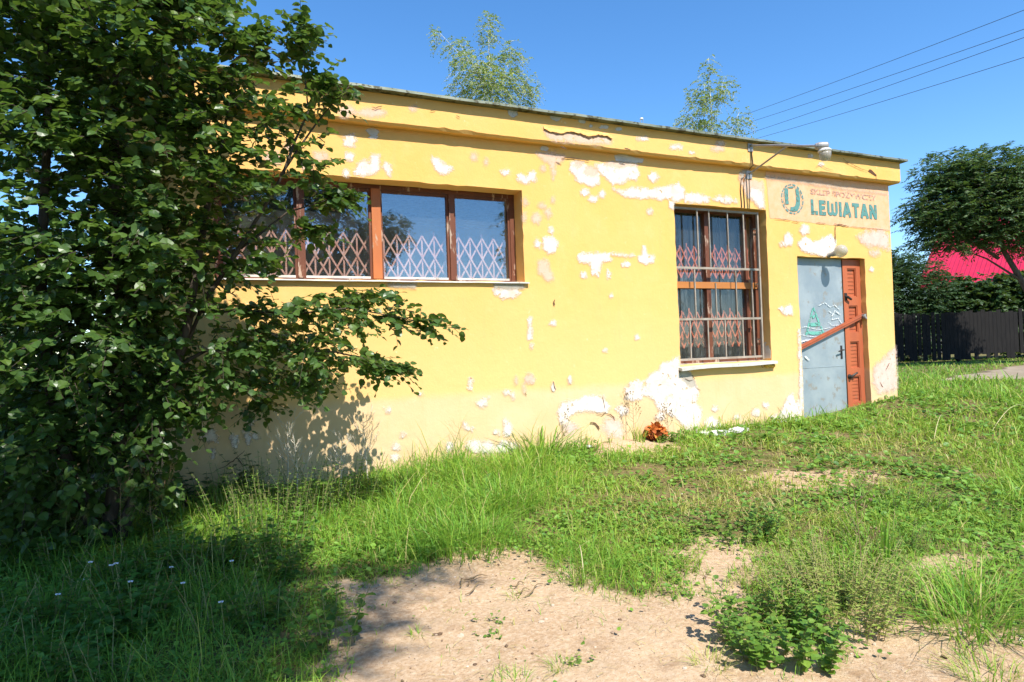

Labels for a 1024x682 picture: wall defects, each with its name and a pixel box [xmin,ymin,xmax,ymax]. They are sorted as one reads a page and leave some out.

peeling [339,106,393,177]
peeling [431,156,454,175]
peeling [500,116,765,215]
peeling [523,198,558,281]
peeling [577,245,655,279]
peeling [780,223,837,257]
peeling [859,229,890,272]
peeling [492,287,521,299]
peeling [557,356,721,438]
peeling [733,328,804,423]
peeling [873,348,898,394]